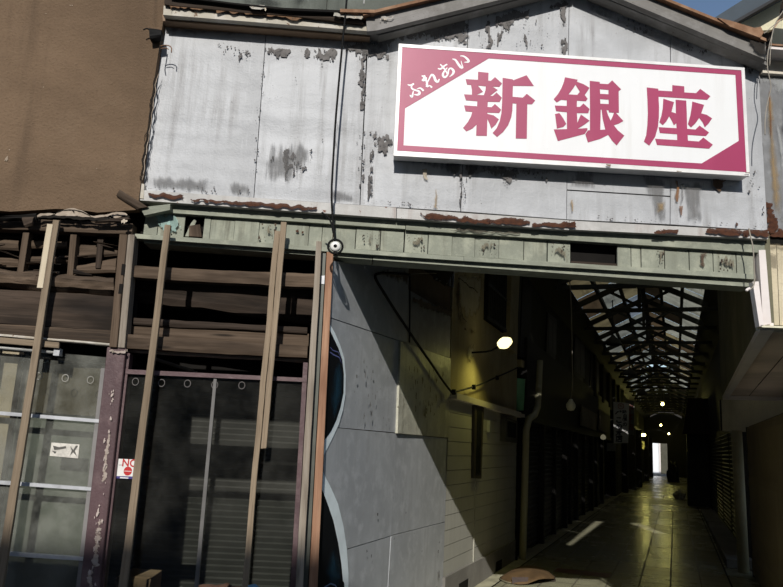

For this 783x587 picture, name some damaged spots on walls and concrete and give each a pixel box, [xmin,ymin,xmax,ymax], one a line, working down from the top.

peeling [479,7,548,48]
peeling [540,0,568,55]
peeling [304,21,469,110]
peeling [358,131,393,202]
corrosion [706,92,783,237]
corrosion [148,192,317,210]
corrosion [420,193,576,228]
peeling [102,430,110,483]
peeling [87,504,103,587]